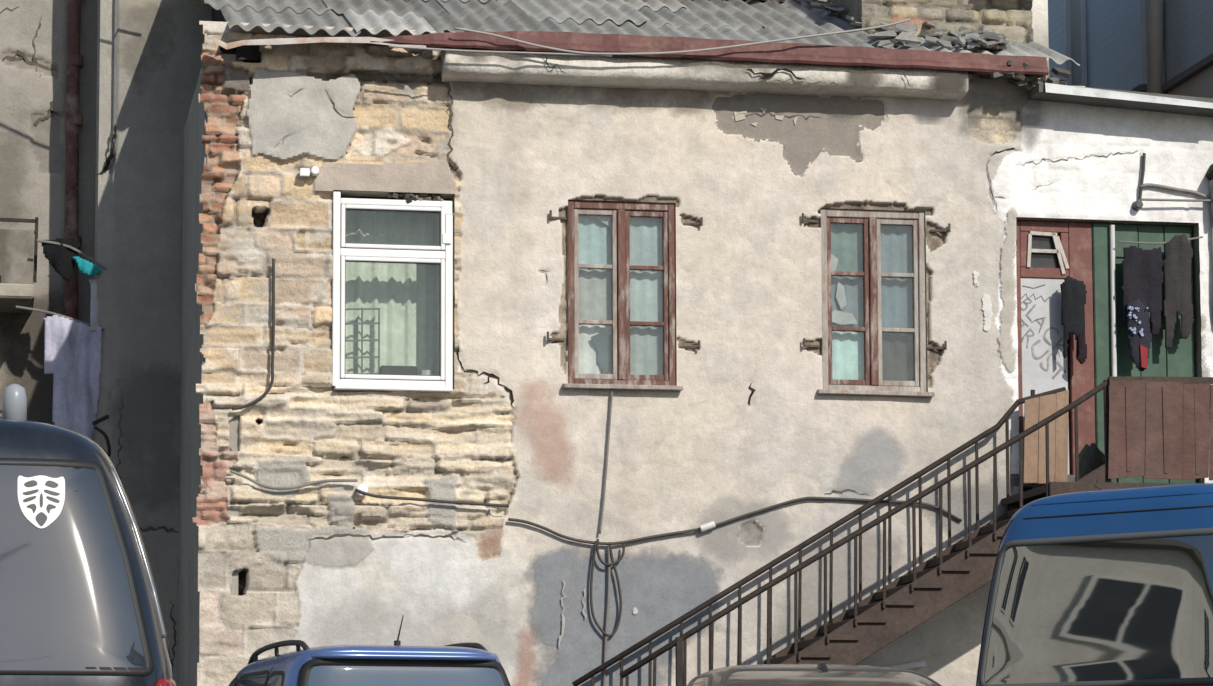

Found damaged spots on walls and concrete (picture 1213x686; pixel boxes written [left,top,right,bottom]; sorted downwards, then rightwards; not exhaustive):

crack [97,125,117,175]
flaking render [197,50,245,325]
peeling [712,93,884,176]
crack [457,348,514,408]
crack [116,393,124,480]
flaking render [193,402,239,525]
crack [140,525,179,533]
crack [169,600,177,670]
leakage [530,549,719,686]